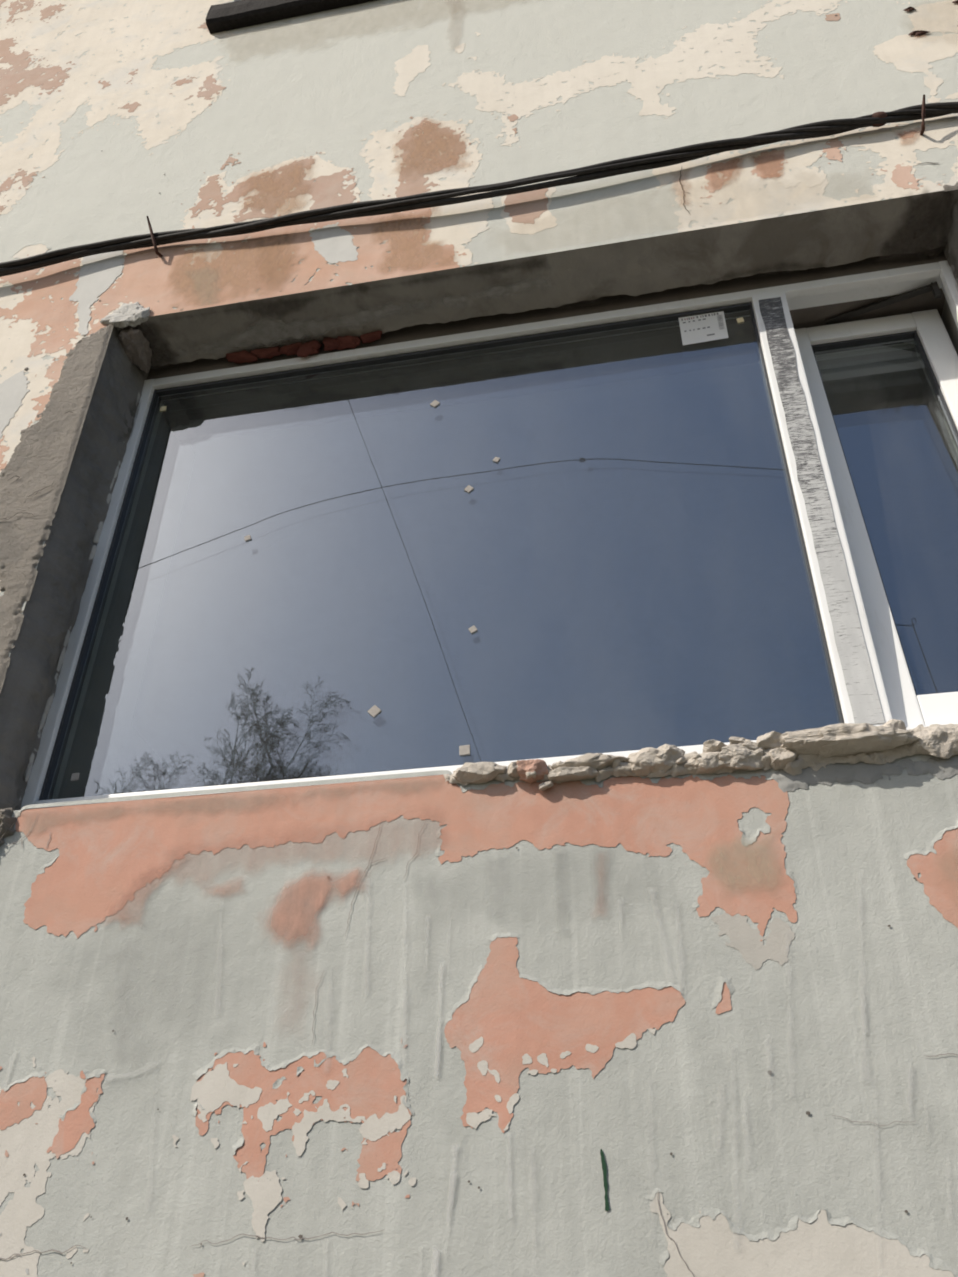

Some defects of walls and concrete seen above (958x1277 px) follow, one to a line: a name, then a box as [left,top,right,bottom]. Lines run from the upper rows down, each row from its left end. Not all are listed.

peeling [652,0,958,232]
peeling [0,0,847,473]
peeling [14,719,958,970]
peeling [0,1057,107,1277]
crack [192,1229,385,1247]
peeling [190,1038,416,1242]
peeling [444,932,685,1133]
peeling [645,1188,958,1277]